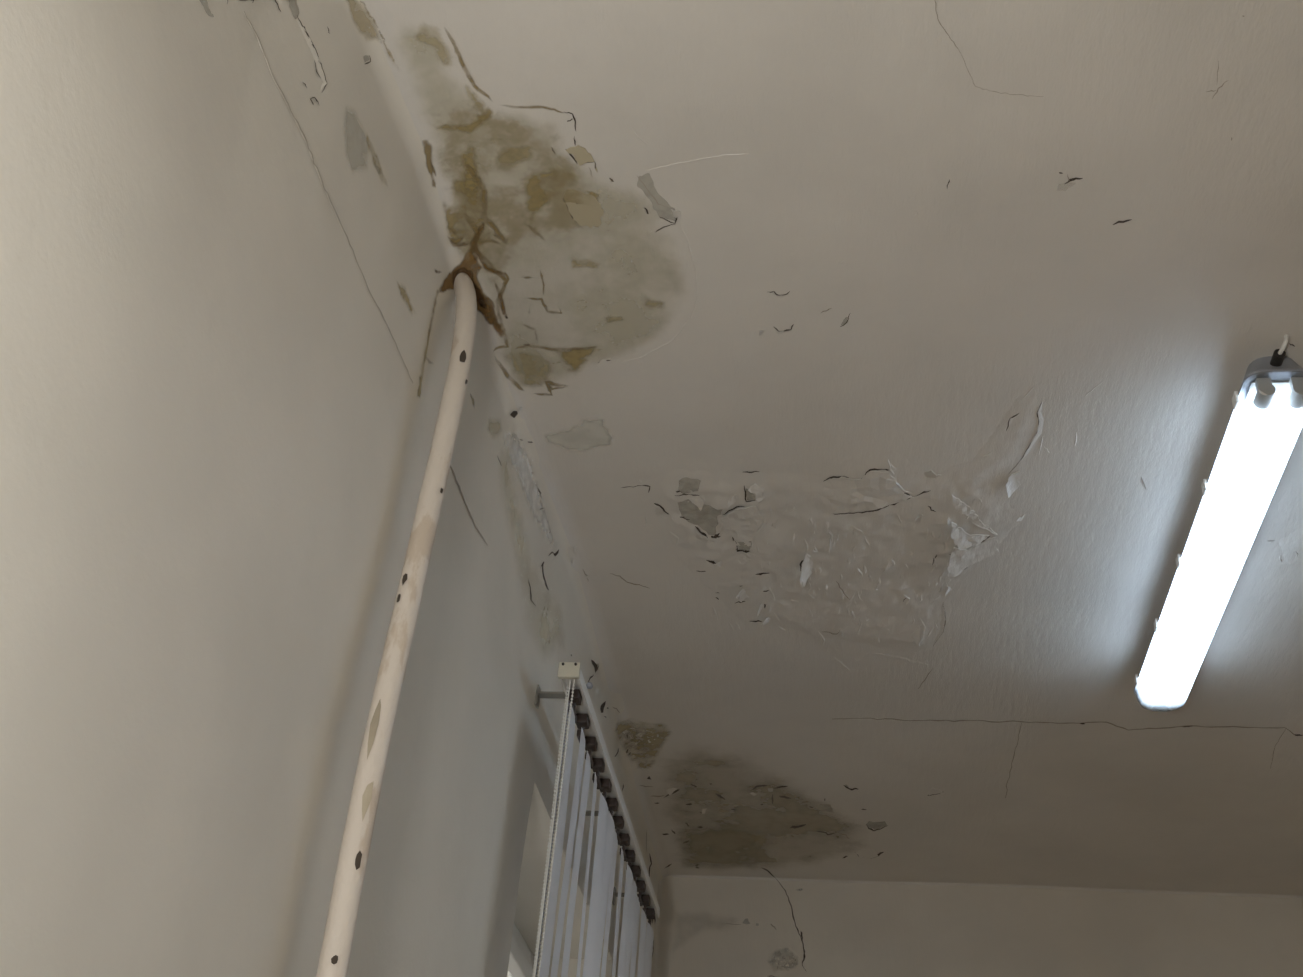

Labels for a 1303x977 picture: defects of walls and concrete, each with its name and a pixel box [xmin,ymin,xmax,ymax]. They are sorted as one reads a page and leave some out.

crack [243,0,413,383]
leakage [419,35,593,395]
peeling [1006,471,1020,498]
peeling [930,495,998,600]
crack [833,718,1303,798]